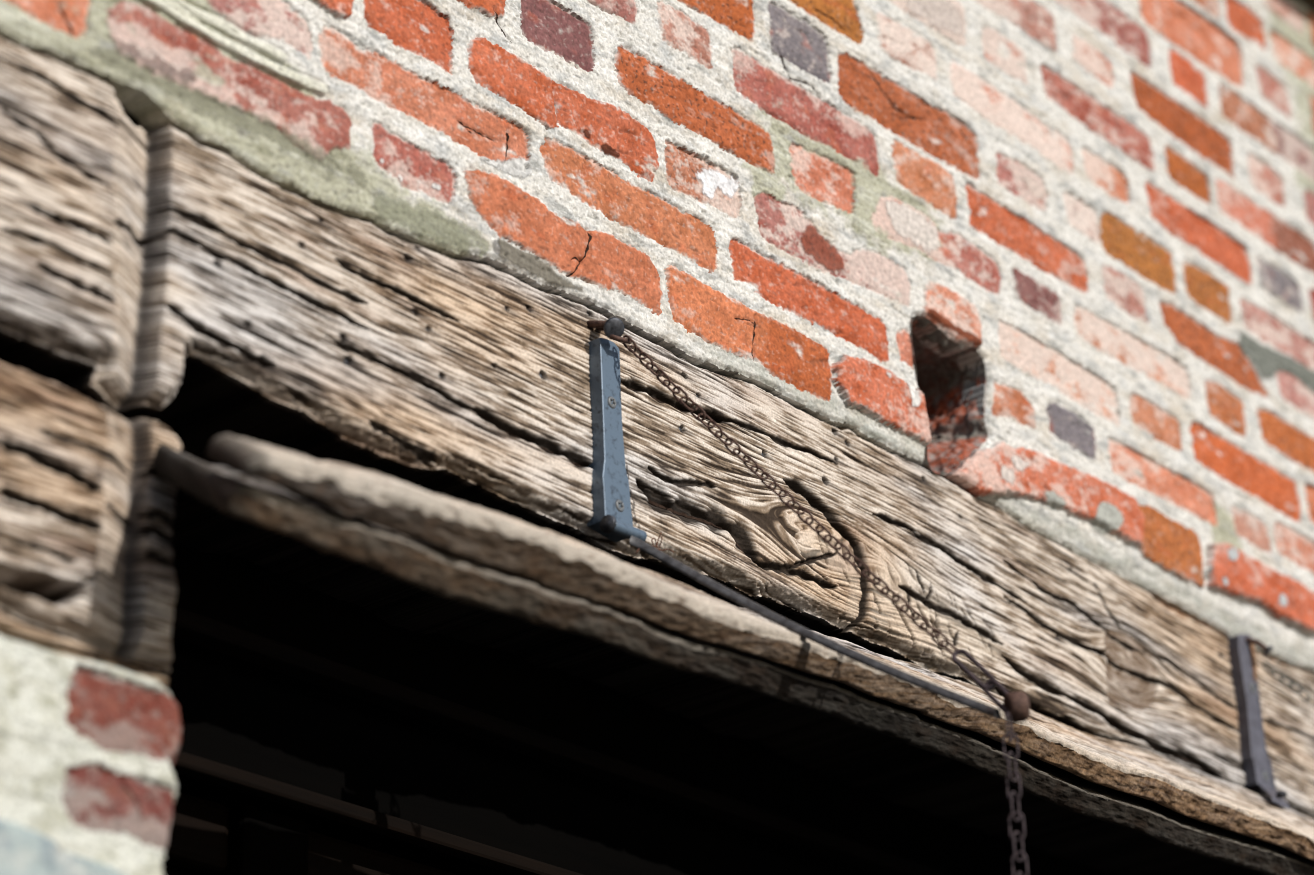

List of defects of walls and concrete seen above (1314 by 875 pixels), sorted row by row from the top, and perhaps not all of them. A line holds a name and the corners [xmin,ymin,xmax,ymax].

crack [566,232,592,277]
spalling [909,309,988,478]